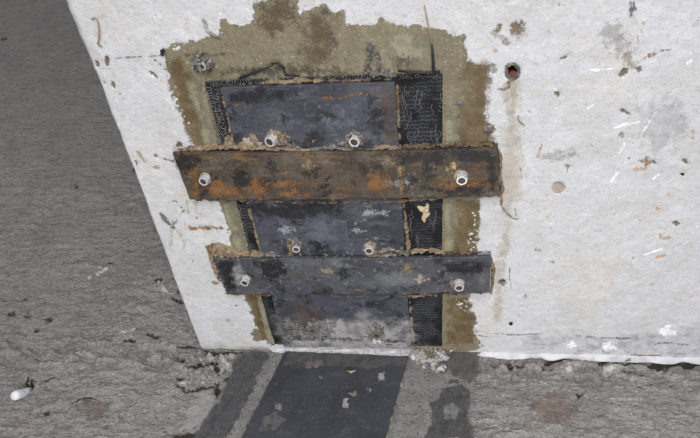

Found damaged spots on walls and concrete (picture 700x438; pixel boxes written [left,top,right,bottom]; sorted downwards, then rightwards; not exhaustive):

leakage [161,0,500,272]
corrosion [188,167,319,200]
leakage [214,261,237,290]
leakage [262,261,287,283]
leakage [244,295,275,346]
leakage [381,293,484,438]